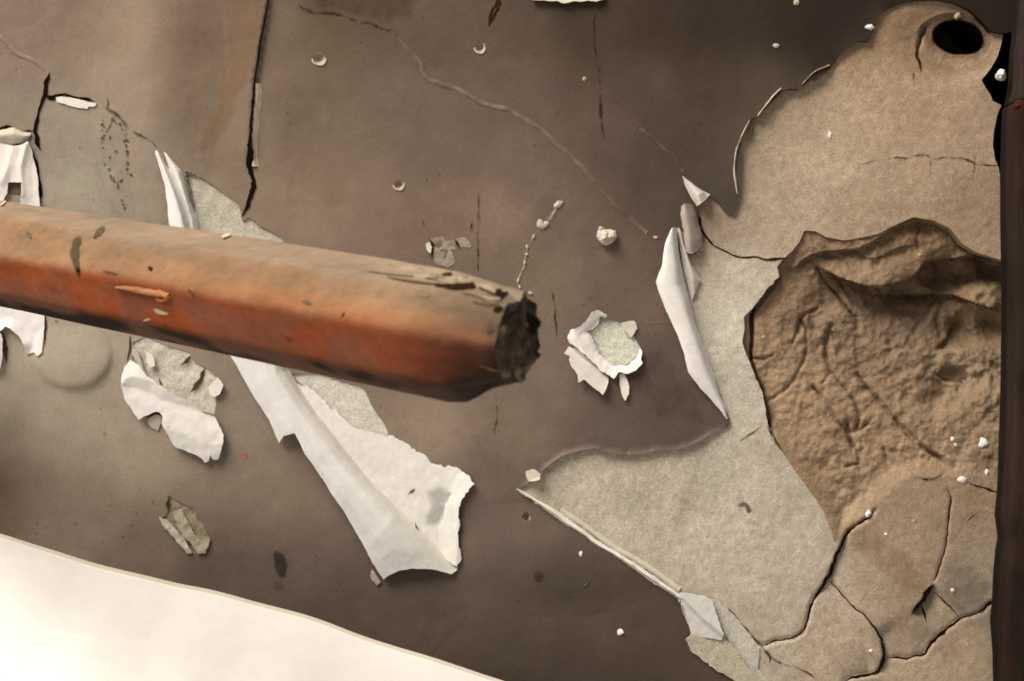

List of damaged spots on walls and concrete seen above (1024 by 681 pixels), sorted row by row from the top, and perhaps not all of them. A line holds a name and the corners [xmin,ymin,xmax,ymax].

peeling [0,127,40,206]
crack [0,71,155,201]
peeling [155,150,286,243]
crack [242,0,269,216]
flaking render [426,221,473,268]
crack [867,154,997,173]
peeling [0,306,47,368]
peeling [121,336,224,463]
peeling [516,1,1003,681]
peeling [159,496,210,555]
peeling [231,356,474,585]
crack [728,482,997,681]